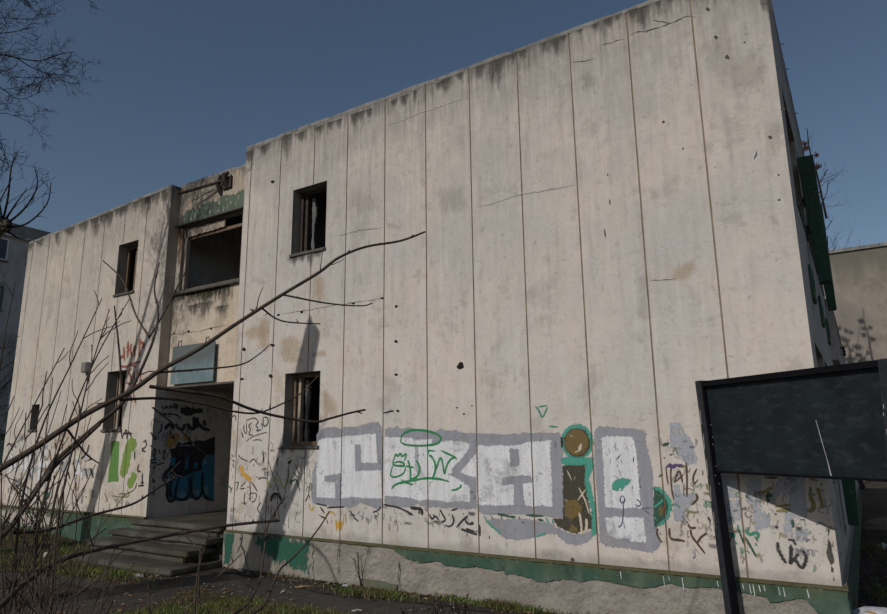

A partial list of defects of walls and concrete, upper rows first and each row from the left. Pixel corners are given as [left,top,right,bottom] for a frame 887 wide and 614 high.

leakage [593,0,660,27]
leakage [475,49,526,80]
leakage [173,285,233,315]
peeling [223,532,234,565]
spalling [253,531,725,614]
spalling [737,582,818,614]